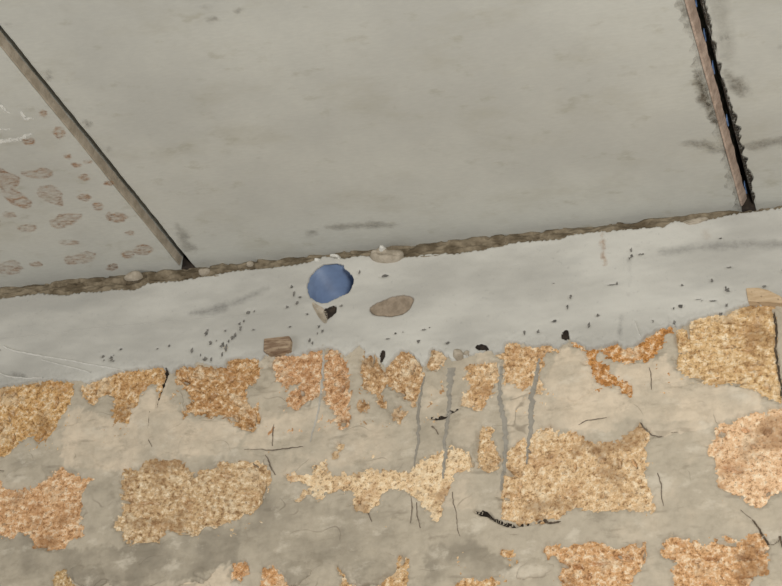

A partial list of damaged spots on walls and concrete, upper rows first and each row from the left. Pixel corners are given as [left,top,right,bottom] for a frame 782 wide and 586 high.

damp [700,0,755,204]
spalling [190,310,255,361]
spalling [305,302,343,345]
crack [772,312,782,398]
crack [431,408,460,434]
crack [476,510,561,528]